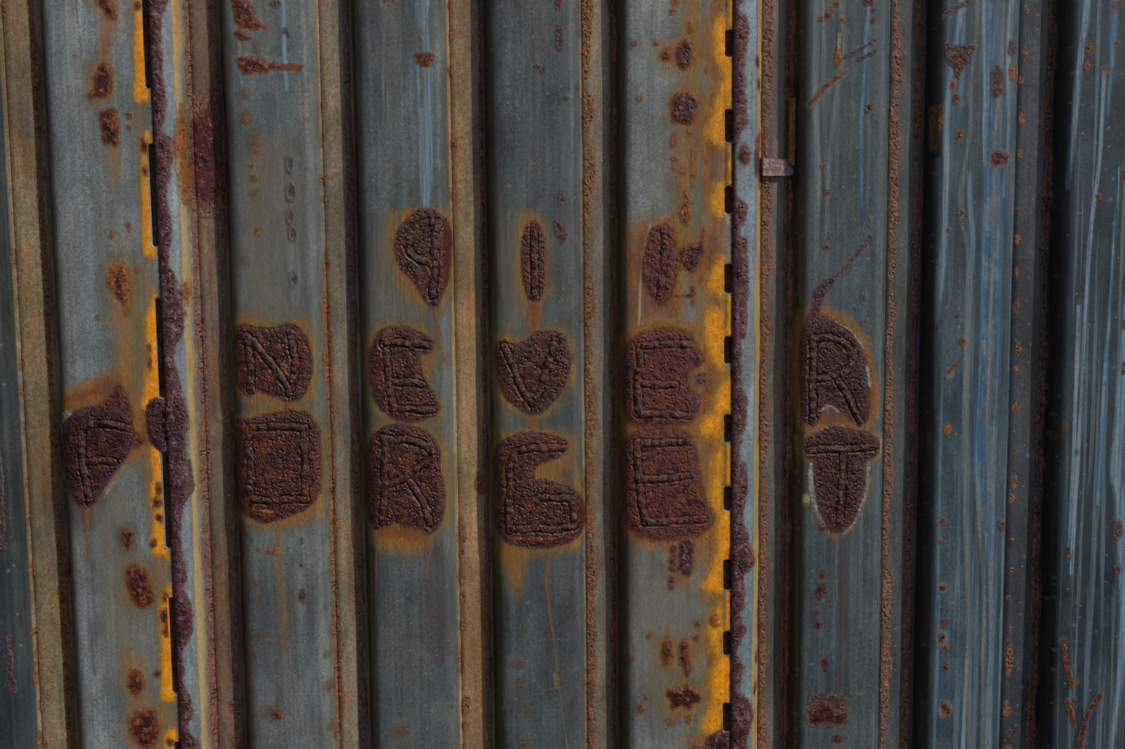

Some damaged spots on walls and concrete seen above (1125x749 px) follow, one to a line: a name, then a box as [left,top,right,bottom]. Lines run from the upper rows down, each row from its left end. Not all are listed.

corrosion [26,0,467,749]
corrosion [461,696,471,730]
corrosion [474,0,977,749]